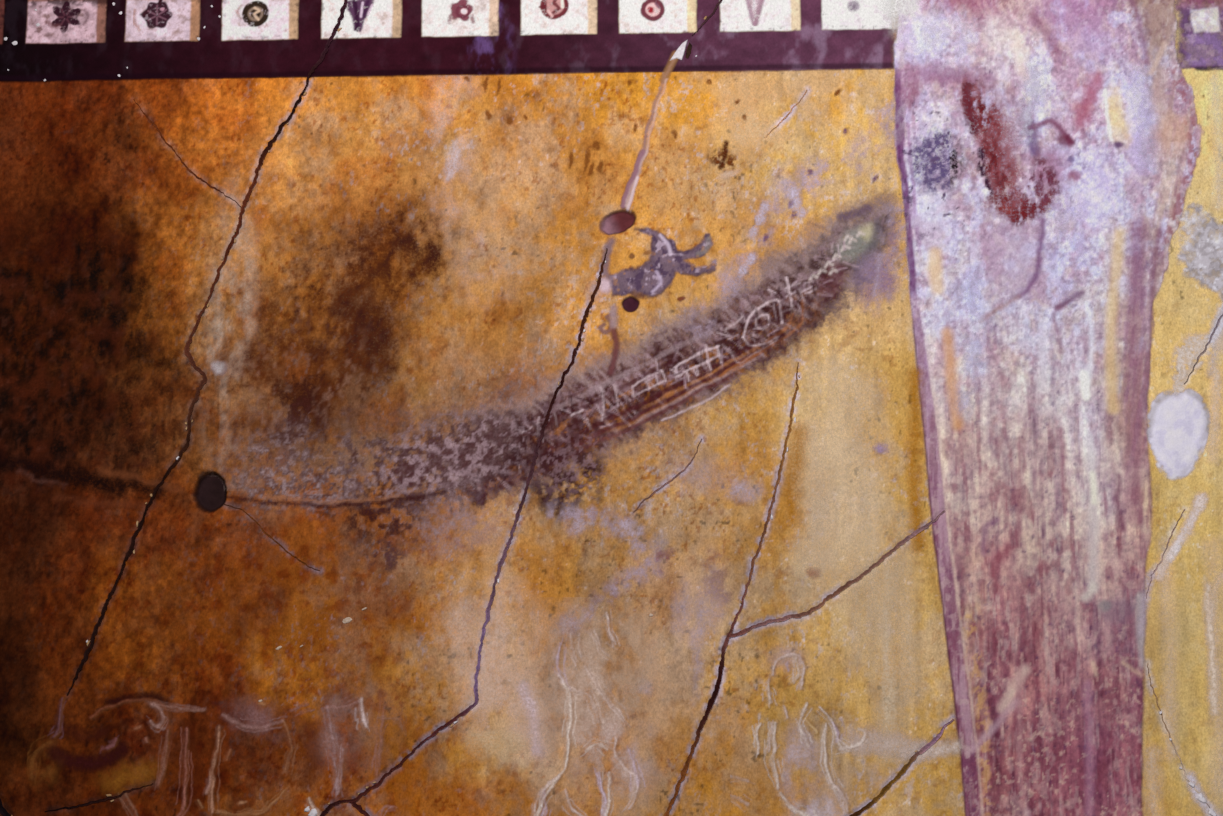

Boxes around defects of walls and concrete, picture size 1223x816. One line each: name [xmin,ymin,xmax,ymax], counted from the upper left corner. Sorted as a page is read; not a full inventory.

crack [692,0,722,36]
crack [764,90,807,138]
crack [67,0,347,695]
crack [1184,314,1223,384]
crack [633,439,702,513]
crack [304,248,607,816]
crack [664,366,954,816]
crack [1146,509,1185,599]
crack [1147,664,1217,816]
crack [0,798,13,816]
crack [45,783,153,812]